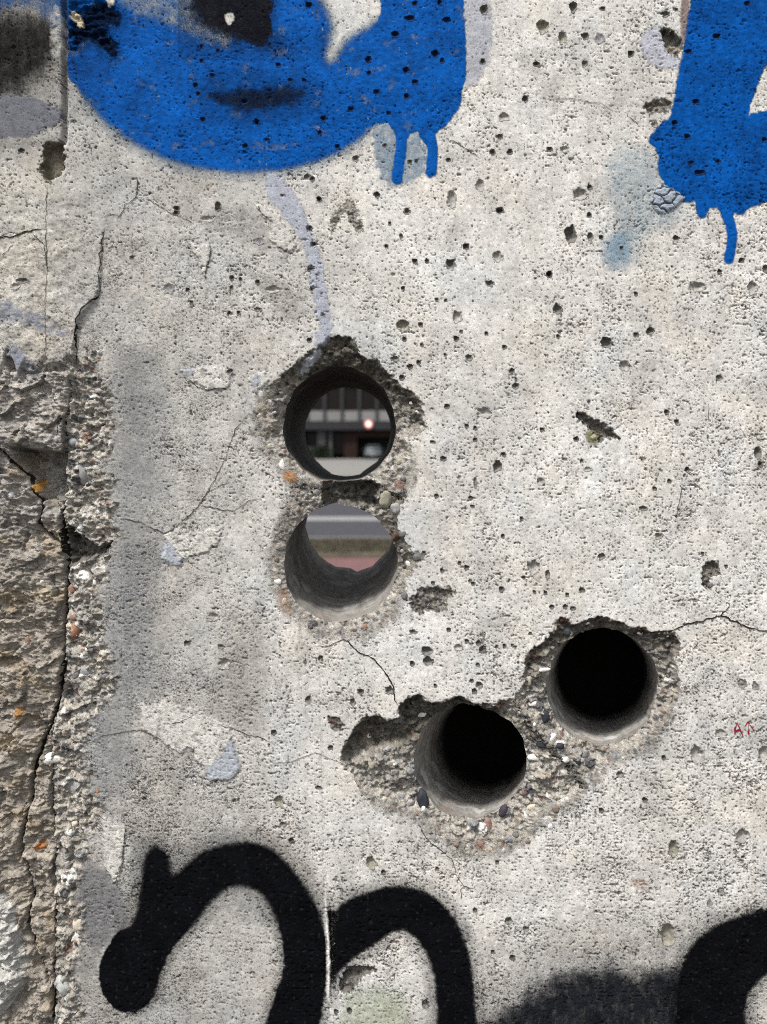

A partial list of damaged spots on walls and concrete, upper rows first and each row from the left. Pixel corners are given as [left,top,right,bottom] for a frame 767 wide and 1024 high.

spalling [38,140,67,184]
crack [73,179,193,362]
crack [3,450,72,621]
crack [121,414,255,534]
spalling [250,335,457,637]
crack [318,639,397,703]
spalling [328,616,681,858]
crack [643,602,767,633]
crack [23,649,68,1017]